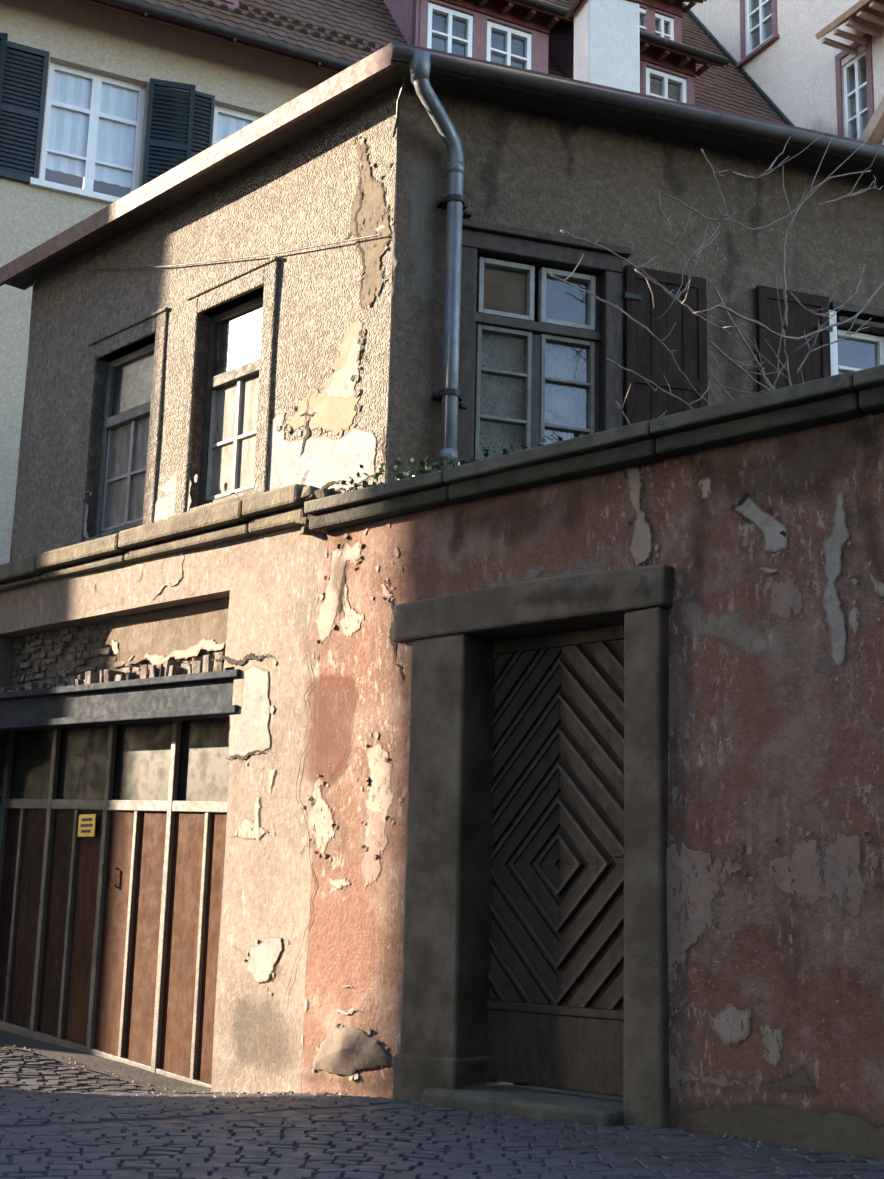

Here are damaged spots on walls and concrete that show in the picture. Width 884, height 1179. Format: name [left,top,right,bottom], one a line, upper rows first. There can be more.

spalling [267,122,395,490]
crack [344,148,366,365]
peeling [618,465,659,566]
peeling [698,477,712,500]
spalling [728,491,810,624]
flaking render [11,620,225,688]
peeling [298,731,402,889]
peeling [768,829,884,917]
spalling [244,937,289,995]
peeling [666,833,816,1092]